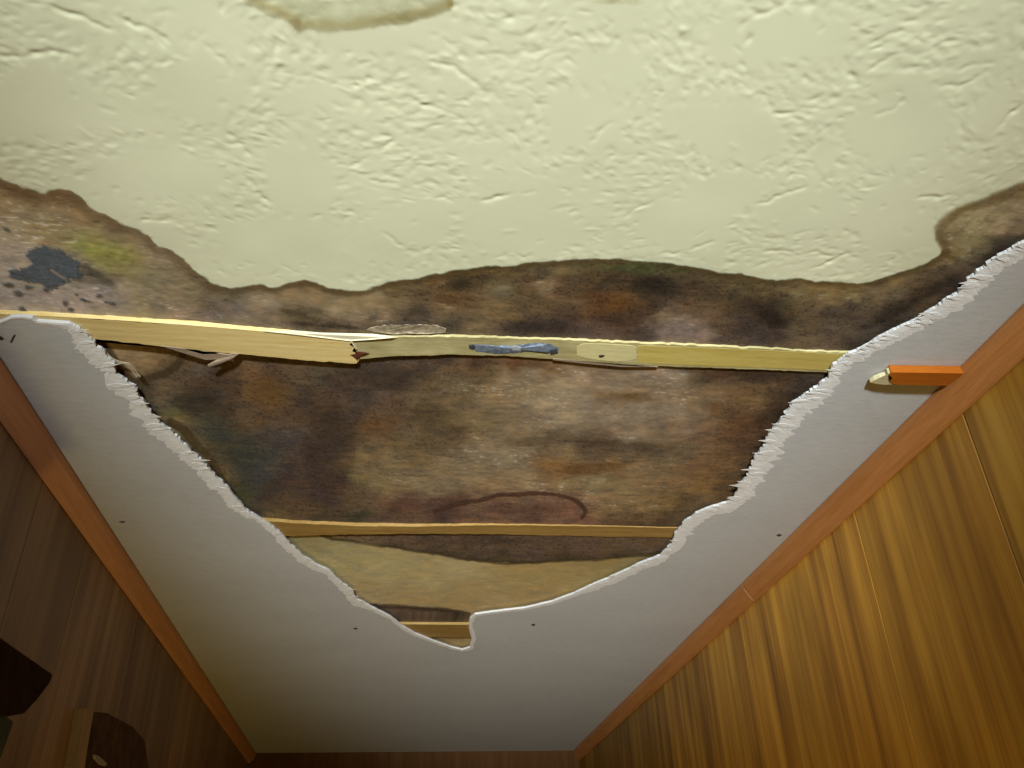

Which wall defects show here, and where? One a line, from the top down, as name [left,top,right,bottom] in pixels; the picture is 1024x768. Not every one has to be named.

damp [251,0,452,30]
damp [0,179,1024,351]
peeling [108,383,170,431]
peeling [756,389,831,455]
damp [96,342,828,622]
peeling [715,468,758,509]